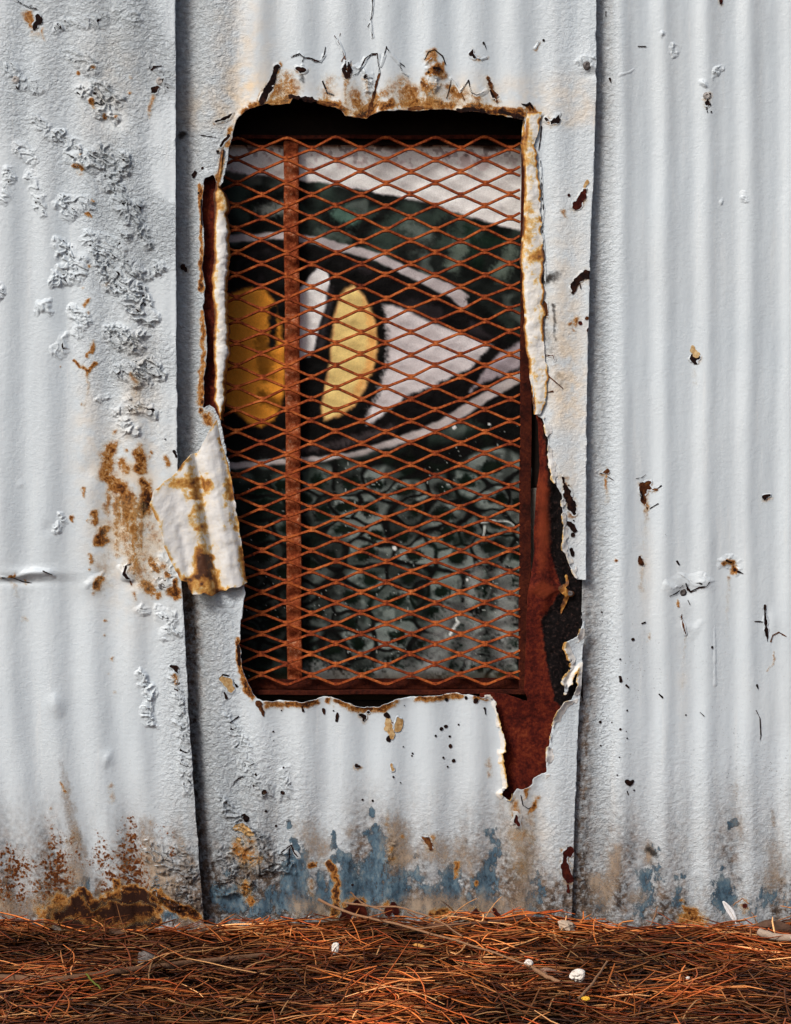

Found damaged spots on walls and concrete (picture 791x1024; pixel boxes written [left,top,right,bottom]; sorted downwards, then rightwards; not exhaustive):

rust [241,48,542,121]
peeling [200,111,235,186]
peeling [561,180,589,217]
peeling [568,269,590,295]
rust [69,430,181,601]
peeling [561,475,578,557]
rust [558,575,574,613]
peeling [218,674,238,699]
peeling [384,705,414,757]
rust [0,808,202,931]
damp [405,832,529,917]
damp [645,844,657,863]